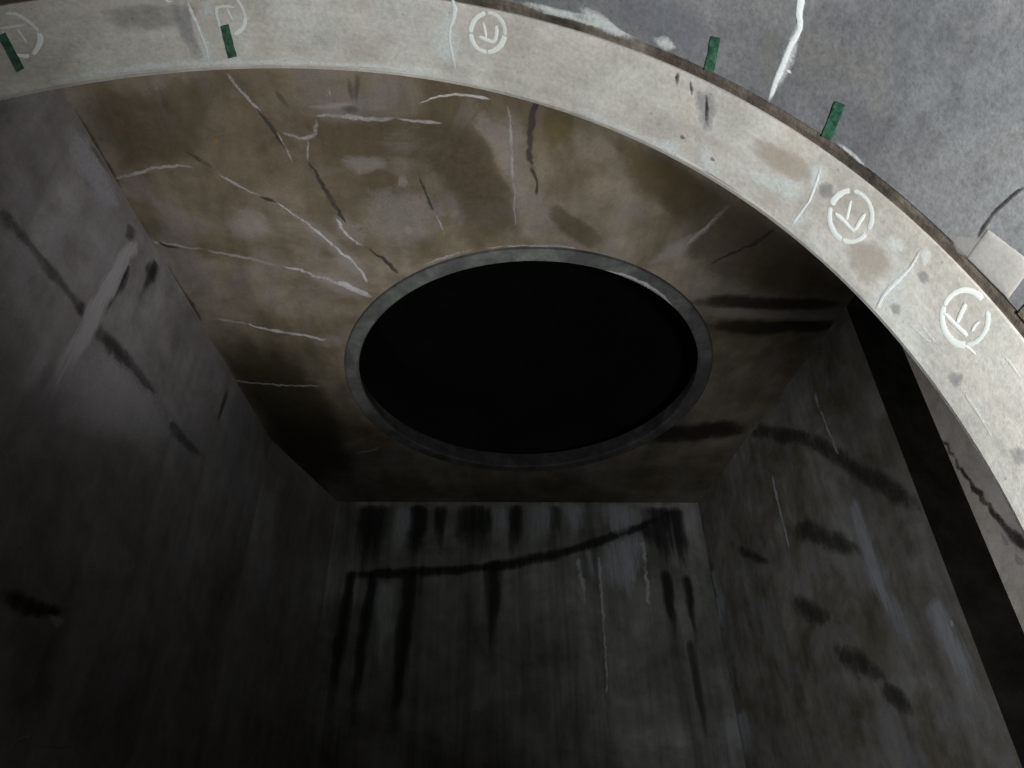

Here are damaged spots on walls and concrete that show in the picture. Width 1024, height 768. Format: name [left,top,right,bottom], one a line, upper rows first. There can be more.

crack [769,0,805,98]
crack [221,77,397,296]
crack [510,103,539,193]
crack [711,166,823,264]
leakage [53,242,171,434]
crack [220,319,323,341]
leakage [358,505,446,558]
leakage [655,422,908,507]
crack [944,442,1024,565]
leakage [332,571,416,708]
leakage [576,507,687,692]
leakage [662,572,694,625]